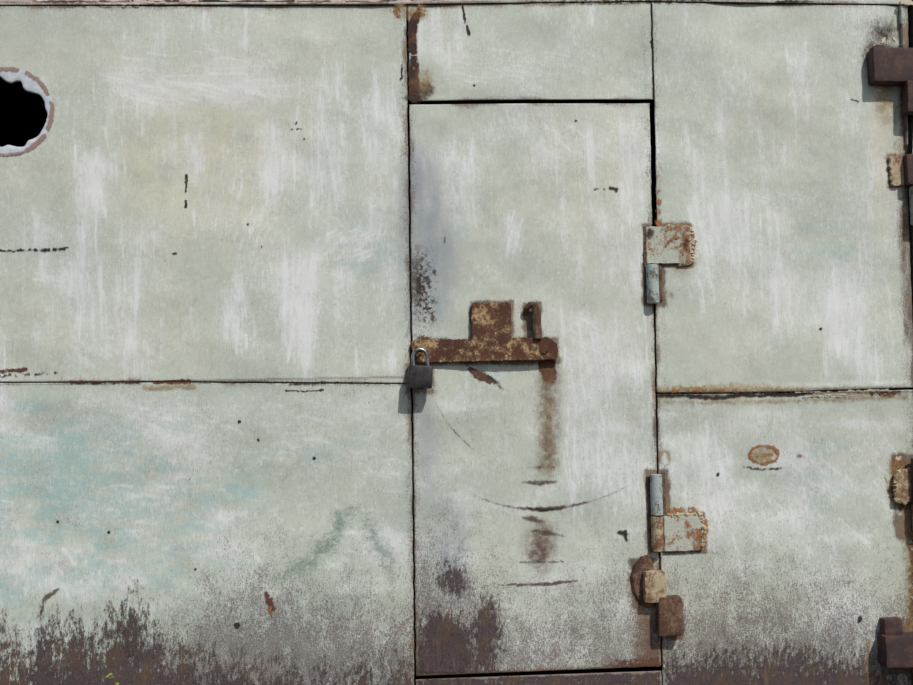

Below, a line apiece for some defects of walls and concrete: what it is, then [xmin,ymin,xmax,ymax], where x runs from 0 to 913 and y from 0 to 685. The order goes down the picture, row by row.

rust [393,4,434,103]
rust [647,190,698,268]
rust [410,255,436,322]
rust [538,360,557,466]
rust [658,385,907,404]
rust [744,444,782,470]